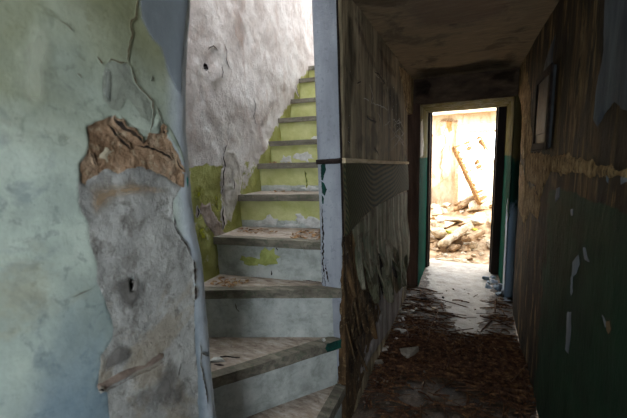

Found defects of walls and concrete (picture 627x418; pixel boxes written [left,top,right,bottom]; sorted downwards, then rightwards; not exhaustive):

crack [97,0,163,131]
peeling [593,0,627,127]
spalling [78,61,199,418]
peeling [195,149,242,236]
crack [220,145,235,230]
peeling [240,248,280,266]
peeling [253,213,320,228]
peeling [280,152,314,163]
peeling [301,164,327,204]
peeling [322,163,437,418]
spalling [518,71,627,223]
peeling [570,247,590,295]